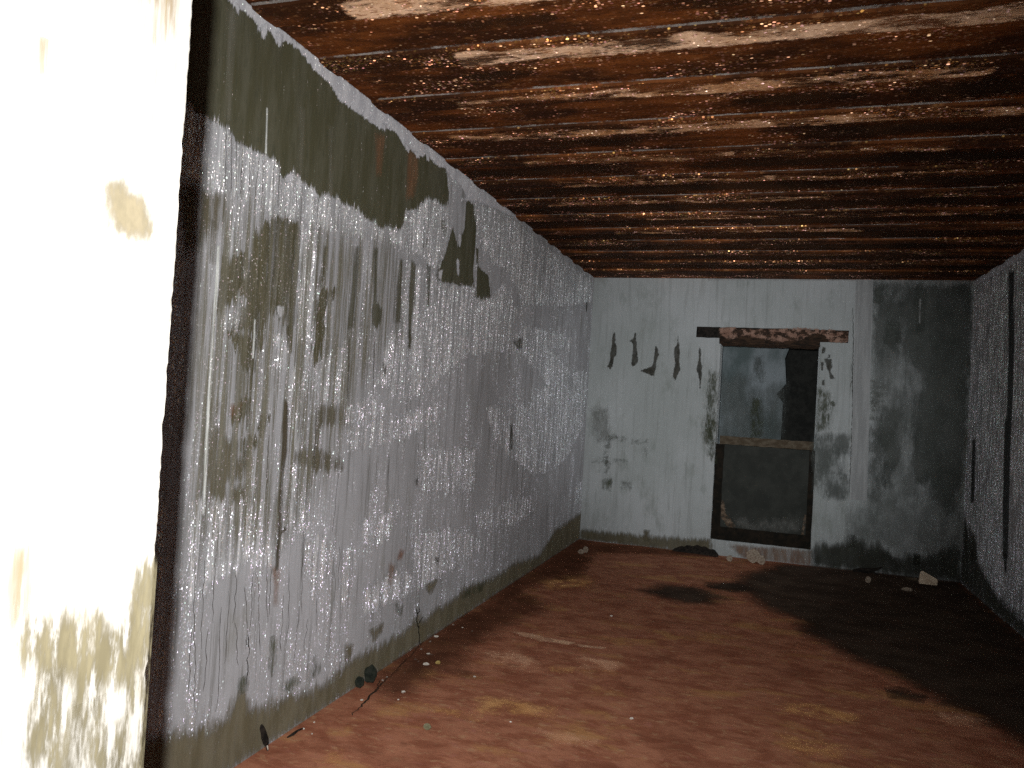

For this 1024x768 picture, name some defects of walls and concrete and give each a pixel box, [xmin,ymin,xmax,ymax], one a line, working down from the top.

peeling [186,0,449,231]
peeling [338,0,550,20]
peeling [449,113,927,140]
peeling [459,64,997,110]
peeling [454,2,1024,67]
water stain [106,182,152,238]
peeling [437,201,490,302]
water stain [180,0,592,616]
water stain [873,250,1024,572]
water stain [21,482,712,768]
crack [352,608,423,715]
water stain [647,519,1024,743]